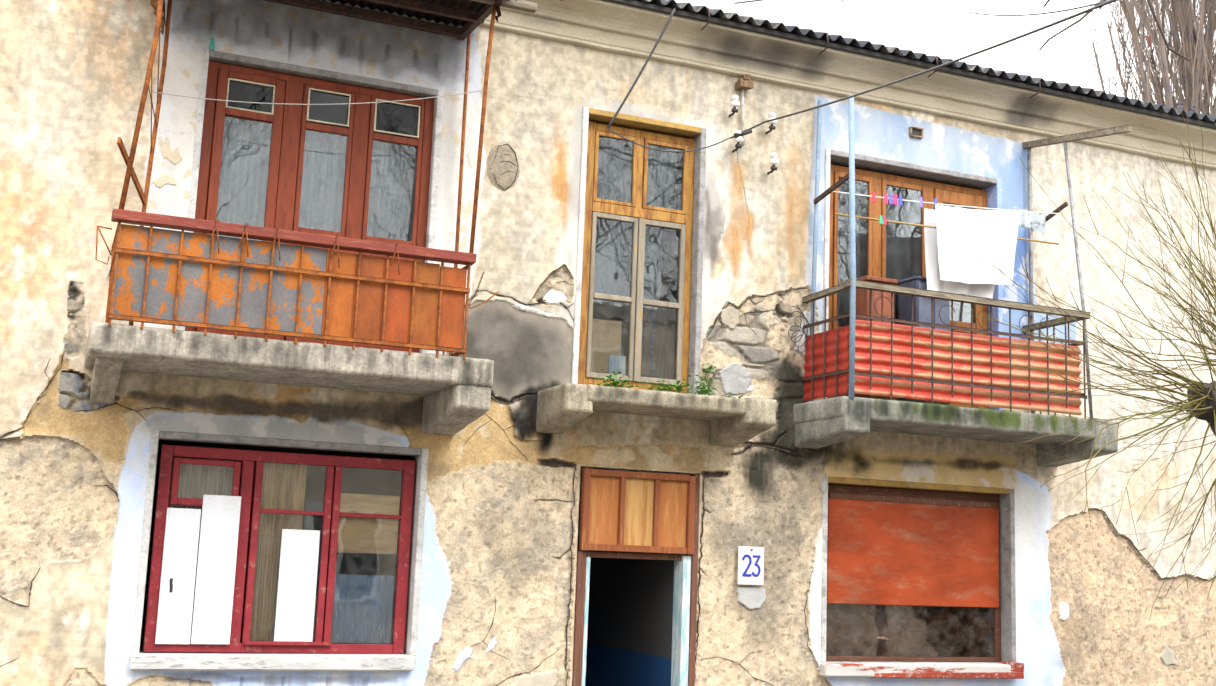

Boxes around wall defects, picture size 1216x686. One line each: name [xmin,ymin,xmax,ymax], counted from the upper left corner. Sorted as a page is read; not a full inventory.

spalling [513,264,574,319]
spalling [64,668,107,686]
spalling [0,349,311,605]
spalling [128,674,213,686]
crack [464,392,576,686]
flaking render [401,285,832,686]
flaking render [1046,508,1216,686]